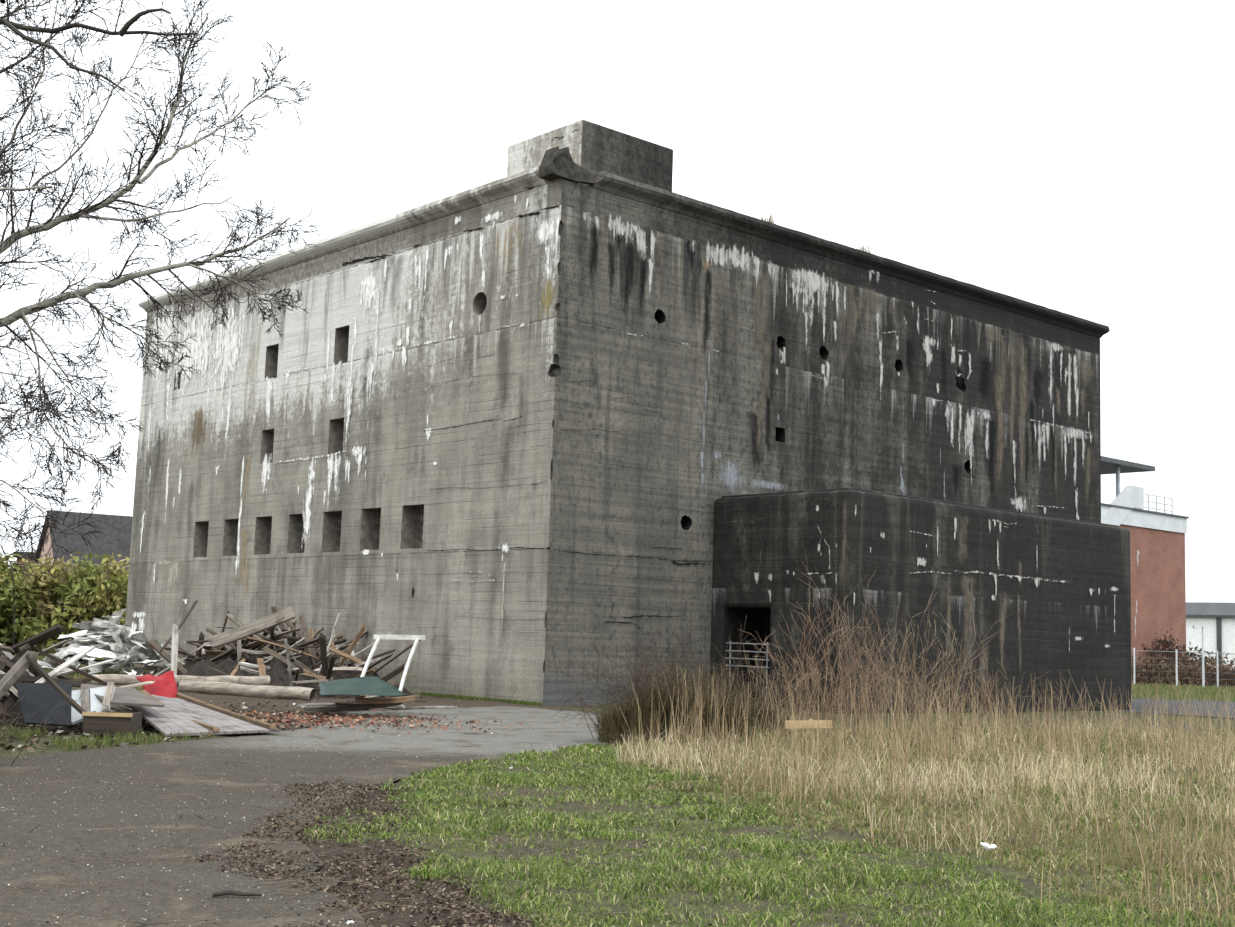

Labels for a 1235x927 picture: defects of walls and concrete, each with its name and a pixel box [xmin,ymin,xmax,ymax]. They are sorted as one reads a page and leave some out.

damp [235,457,244,570]
damp [144,248,457,548]
damp [583,212,656,302]
damp [687,240,1092,672]